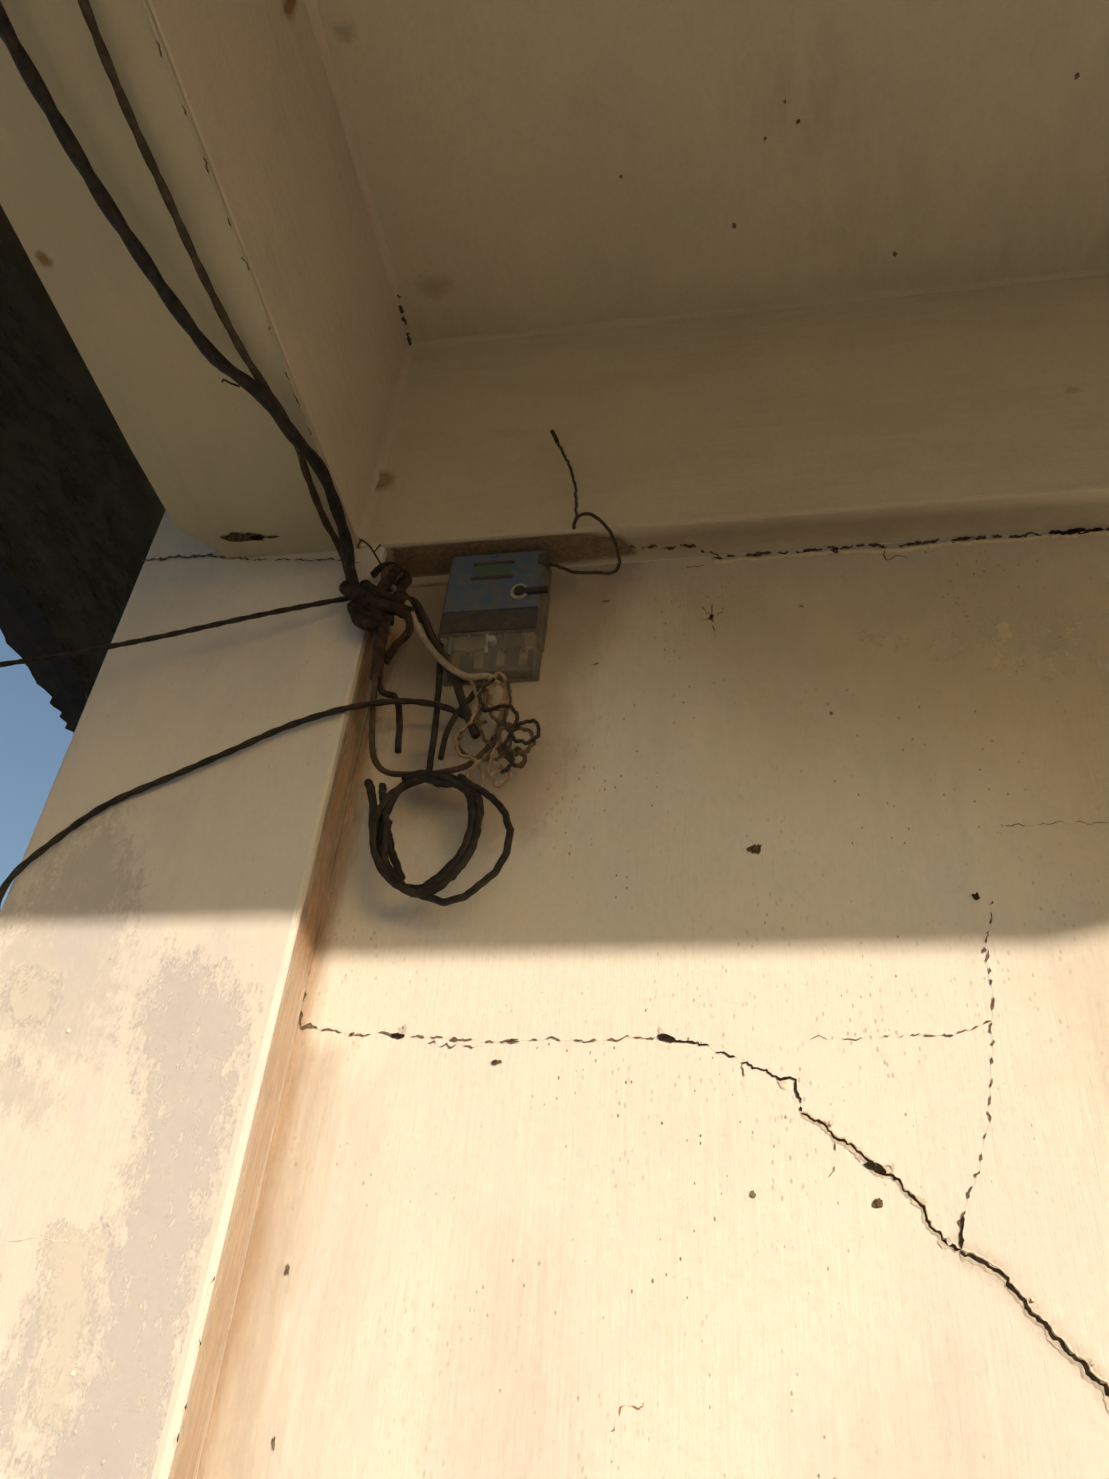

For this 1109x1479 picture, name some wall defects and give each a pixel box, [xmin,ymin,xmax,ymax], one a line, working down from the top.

crack [629,527,1109,568]
crack [299,818,1109,1412]